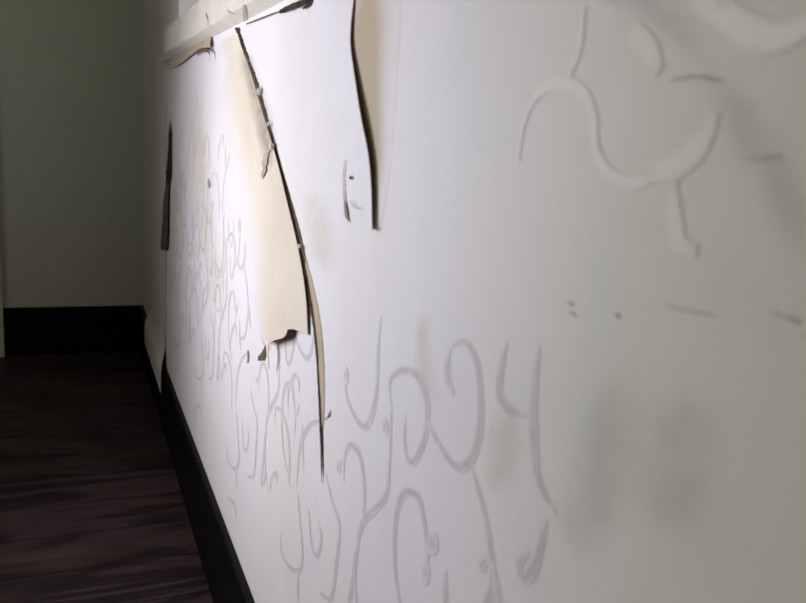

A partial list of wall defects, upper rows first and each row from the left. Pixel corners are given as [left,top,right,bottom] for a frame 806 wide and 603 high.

flaking render [343,0,401,229]